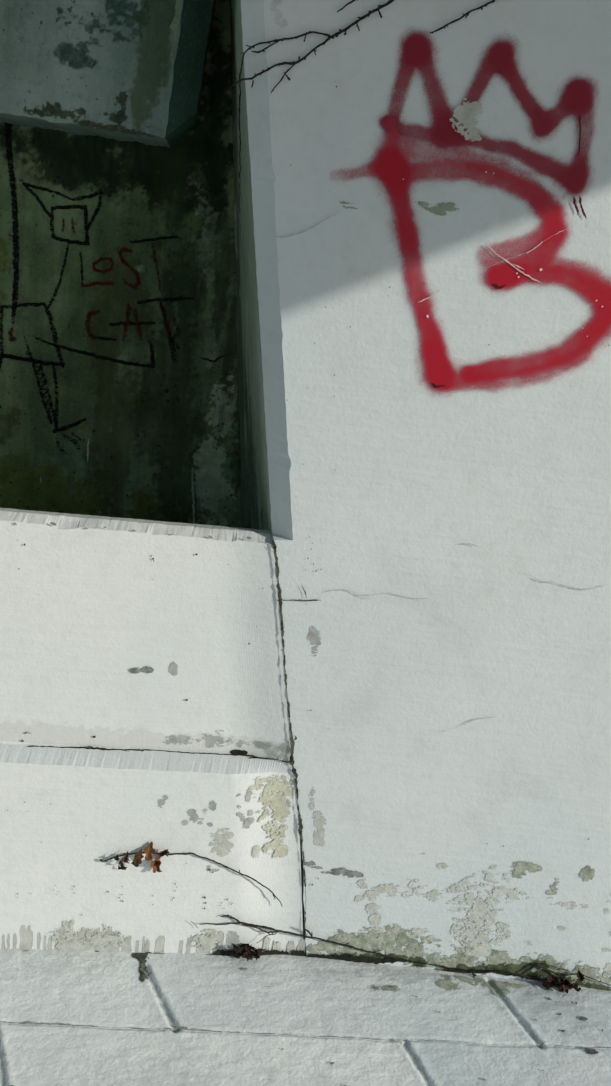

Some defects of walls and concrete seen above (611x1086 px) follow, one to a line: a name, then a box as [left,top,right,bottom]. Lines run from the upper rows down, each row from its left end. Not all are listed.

damp [54,0,146,69]
peeling [449,97,483,142]
damp [190,371,238,527]
peeling [182,775,294,873]
peeling [2,914,165,982]
peeling [179,929,239,954]
peeling [262,861,611,990]